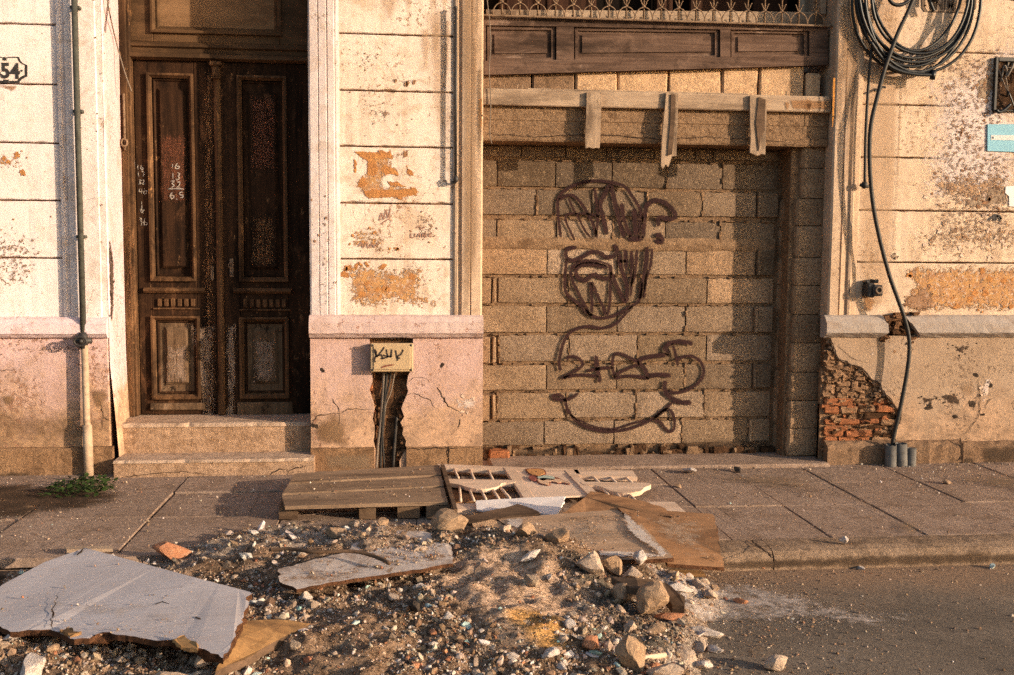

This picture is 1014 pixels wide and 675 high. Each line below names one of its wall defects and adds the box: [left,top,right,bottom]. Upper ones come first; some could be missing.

peeling [0,150,28,176]
peeling [354,150,418,200]
peeling [879,49,1014,344]
peeling [311,195,439,308]
water stain [93,392,107,406]
spalling [370,372,410,468]
crack [407,377,482,462]
spalling [816,337,898,460]
spalling [919,373,992,416]